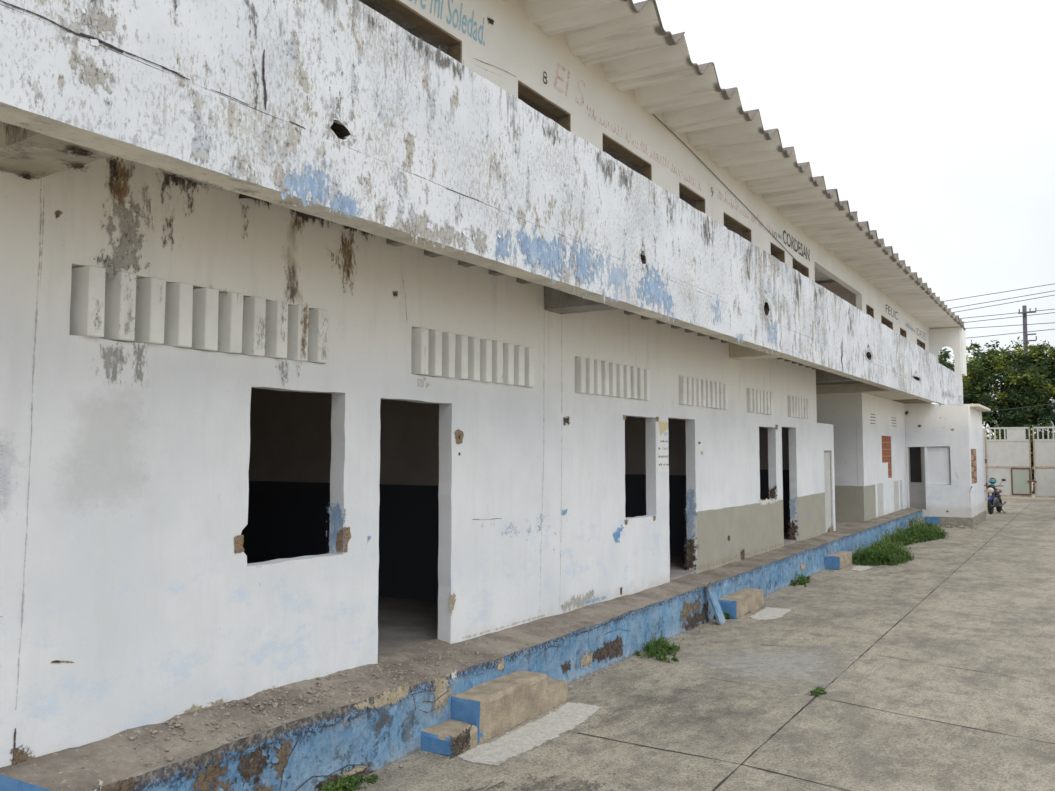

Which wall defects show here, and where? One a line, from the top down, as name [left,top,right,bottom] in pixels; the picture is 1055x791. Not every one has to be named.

crack [0,0,267,110]
damp [137,168,222,250]
peeling [405,211,674,322]
damp [100,289,145,382]
peeling [762,292,780,356]
spalling [234,535,245,554]
peeling [326,502,351,554]
peeling [683,486,699,571]
spalling [679,593,711,631]
spalling [561,636,623,674]
spalling [354,682,410,712]
spalling [184,736,292,791]